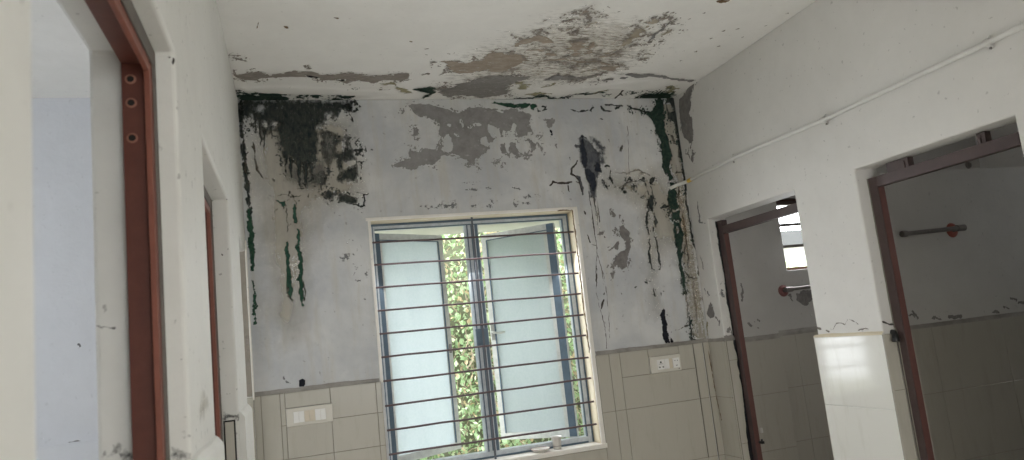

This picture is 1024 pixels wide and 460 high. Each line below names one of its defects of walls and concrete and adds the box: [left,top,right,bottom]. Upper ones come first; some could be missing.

spalling [228,54,409,90]
spalling [391,5,697,171]
leakage [236,88,373,397]
leakage [493,86,699,297]
peeling [597,208,633,280]
peeling [788,290,813,316]